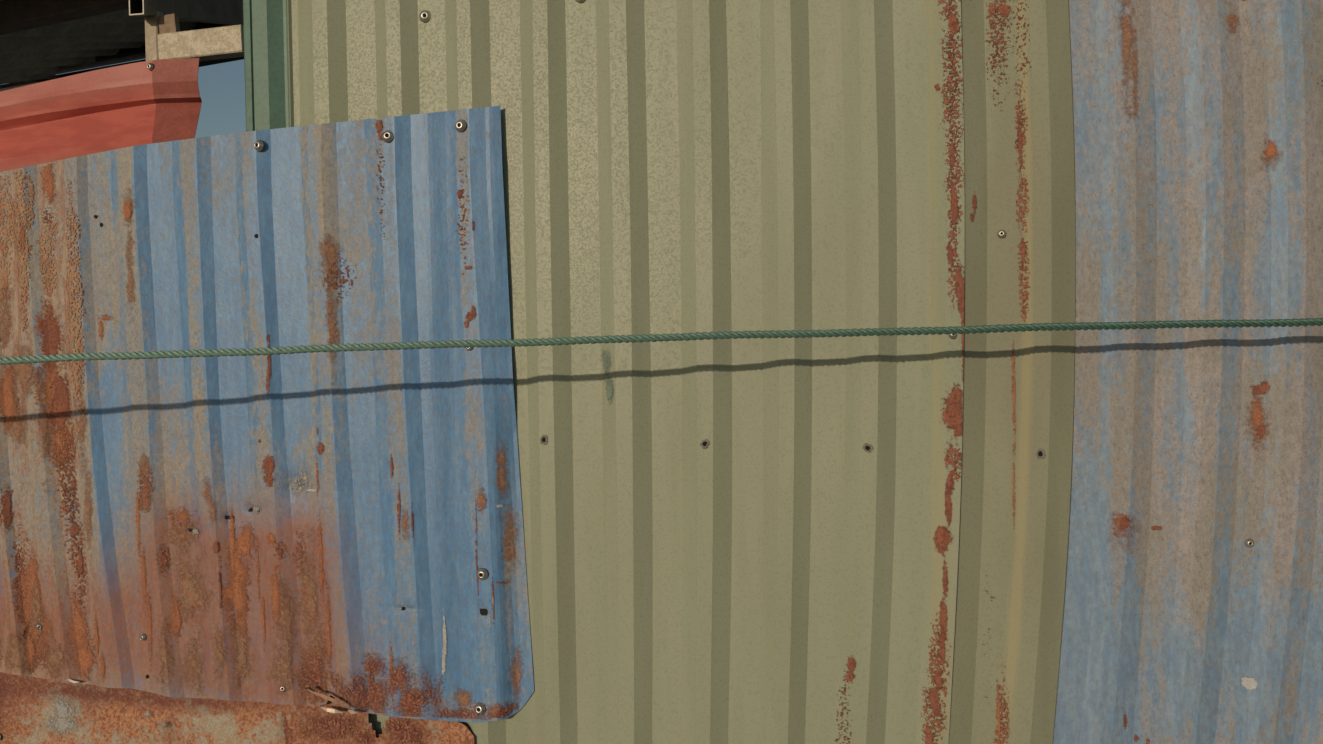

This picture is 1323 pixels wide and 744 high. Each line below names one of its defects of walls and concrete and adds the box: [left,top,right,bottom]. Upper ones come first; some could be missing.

corrosion [934,0,977,380]
corrosion [1263,139,1277,161]
corrosion [985,0,1031,524]
corrosion [0,157,522,744]
corrosion [1250,381,1271,443]
corrosion [1113,513,1131,536]
corrosion [835,657,856,744]
corrosion [920,612,951,744]
corrosion [993,655,1010,744]